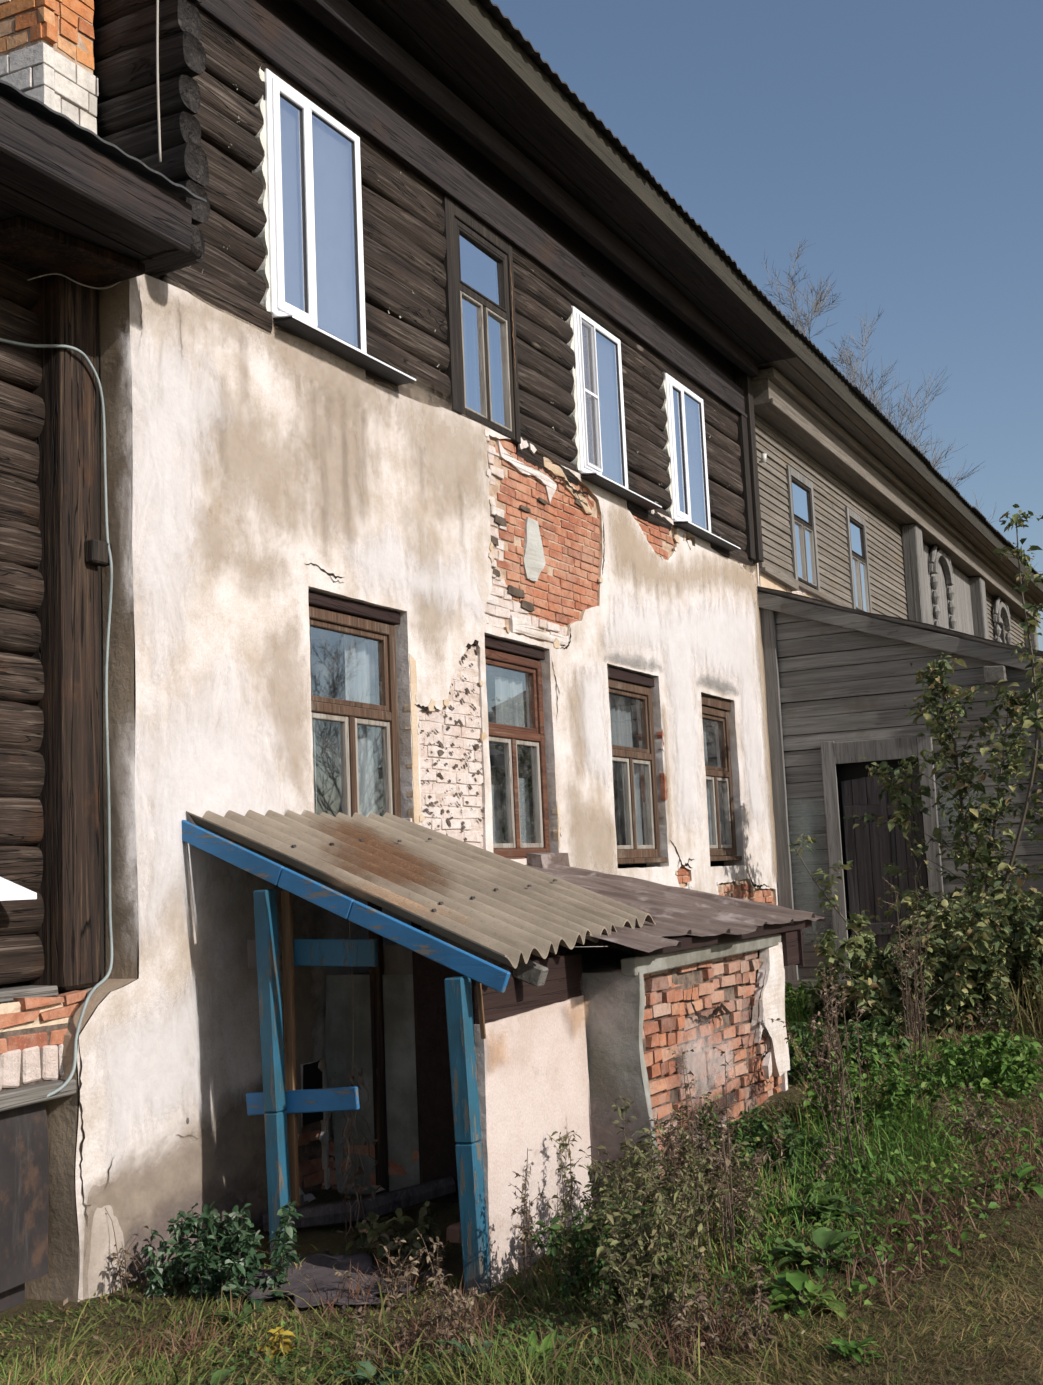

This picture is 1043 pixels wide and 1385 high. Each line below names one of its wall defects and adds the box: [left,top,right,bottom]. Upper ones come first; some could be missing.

crack [306,563,344,583]
spalling [484,429,603,649]
spalling [632,510,695,560]
peeling [404,640,487,850]
crack [78,1038,116,1259]